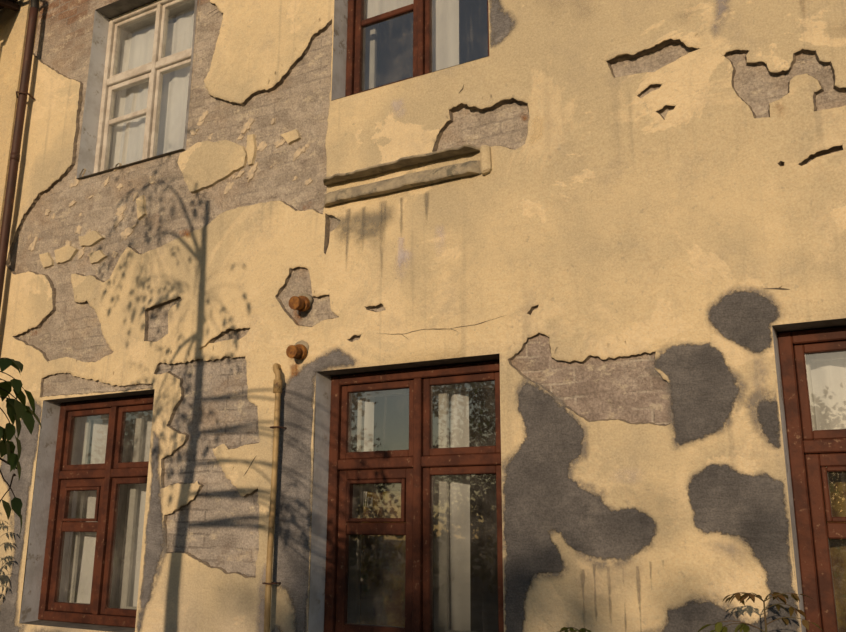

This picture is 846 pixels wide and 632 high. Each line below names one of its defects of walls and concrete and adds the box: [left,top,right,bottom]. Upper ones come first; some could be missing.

spalling [431,85,533,152]
spalling [600,26,702,98]
spalling [656,98,679,120]
spalling [720,41,846,118]
spalling [6,0,341,578]
spalling [507,300,672,426]